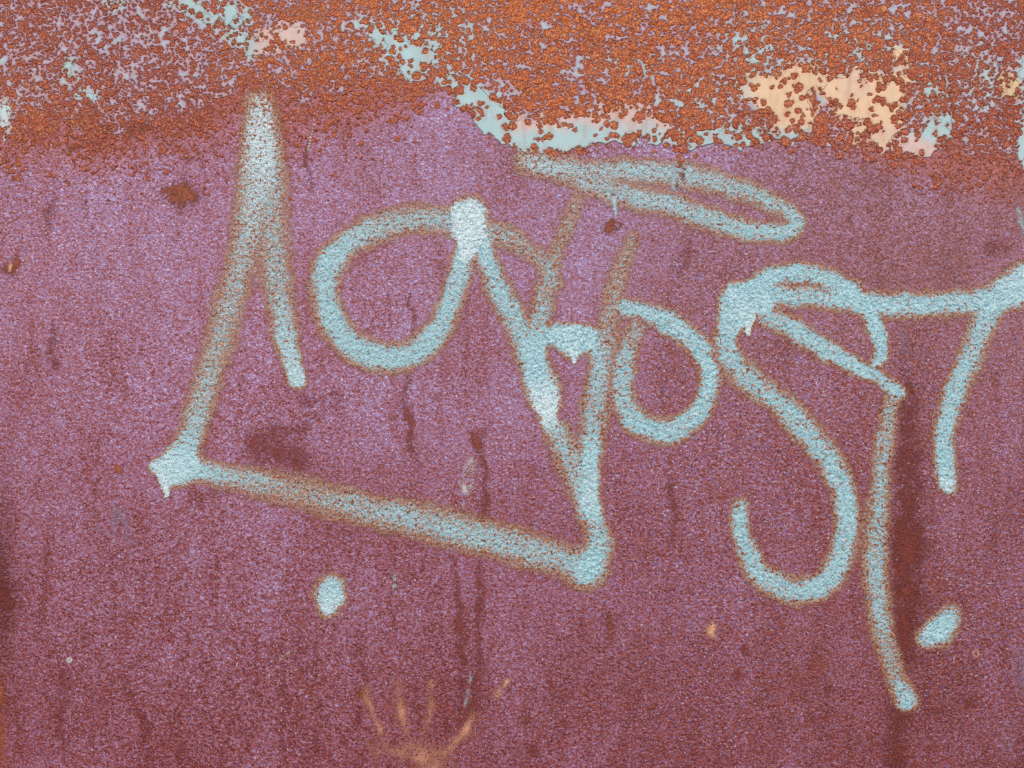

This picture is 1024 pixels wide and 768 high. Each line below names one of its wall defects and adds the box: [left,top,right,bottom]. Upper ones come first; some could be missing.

corrosion [0,0,1024,211]
peeling [447,49,952,160]